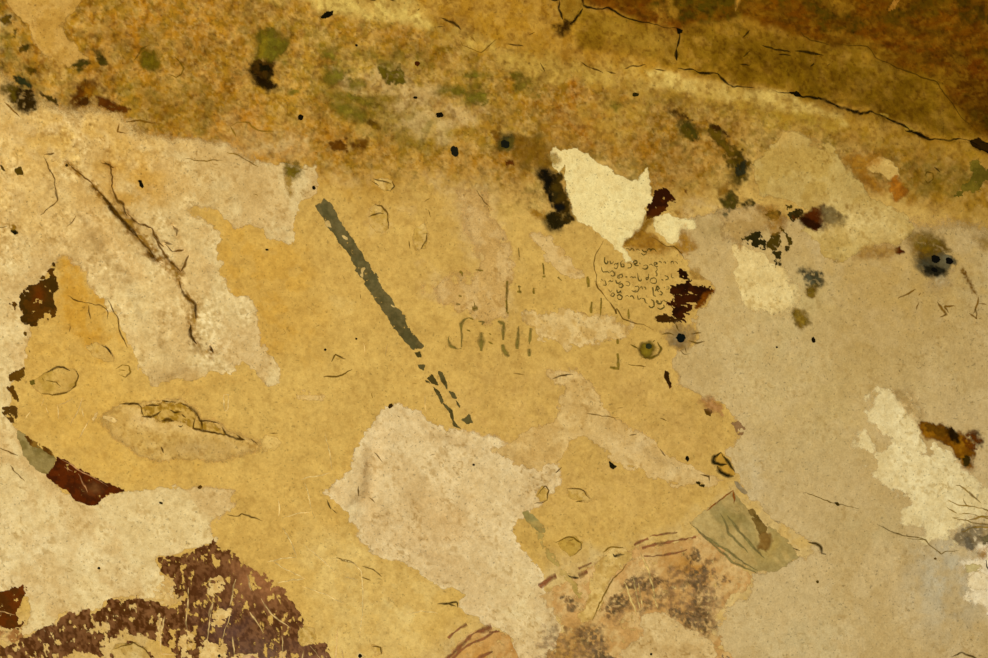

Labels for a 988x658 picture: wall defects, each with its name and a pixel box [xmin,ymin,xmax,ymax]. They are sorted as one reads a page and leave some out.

leakage [378,67,406,85]
leakage [440,74,488,106]
crack [441,18,534,53]
leakage [555,19,573,36]
crack [552,0,988,153]
mould [497,134,574,231]
peeling [954,159,988,197]
crack [41,153,214,358]
crack [67,295,131,377]
flaking render [0,71,343,658]
flaking render [323,188,988,658]
corrosion [894,392,982,469]